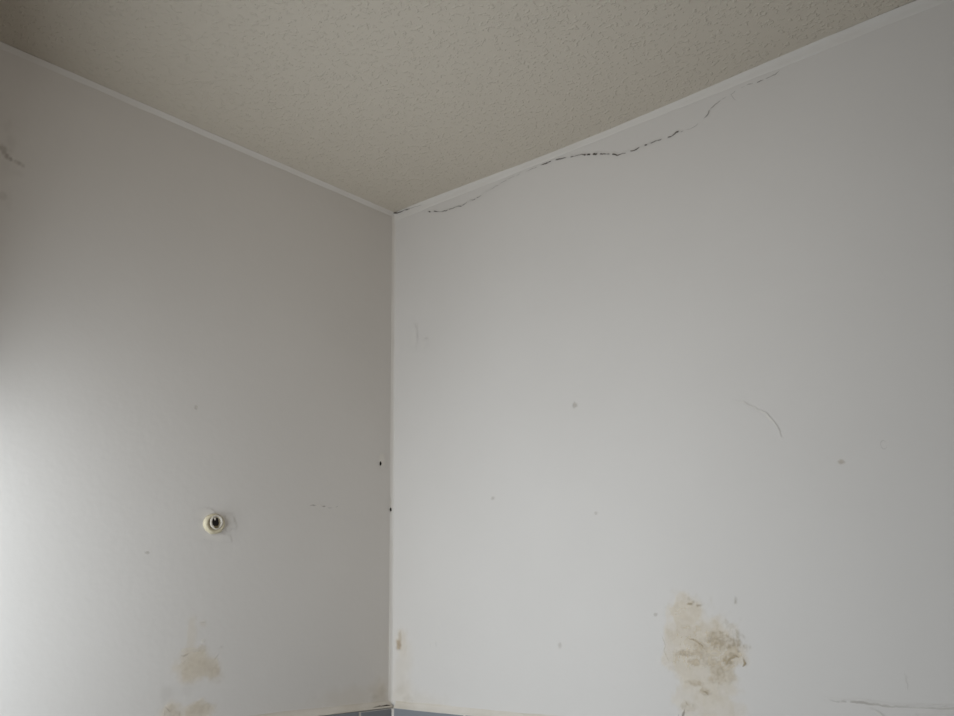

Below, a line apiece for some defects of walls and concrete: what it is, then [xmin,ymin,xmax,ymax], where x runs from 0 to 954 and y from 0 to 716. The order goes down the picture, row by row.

crack [394,130,682,214]